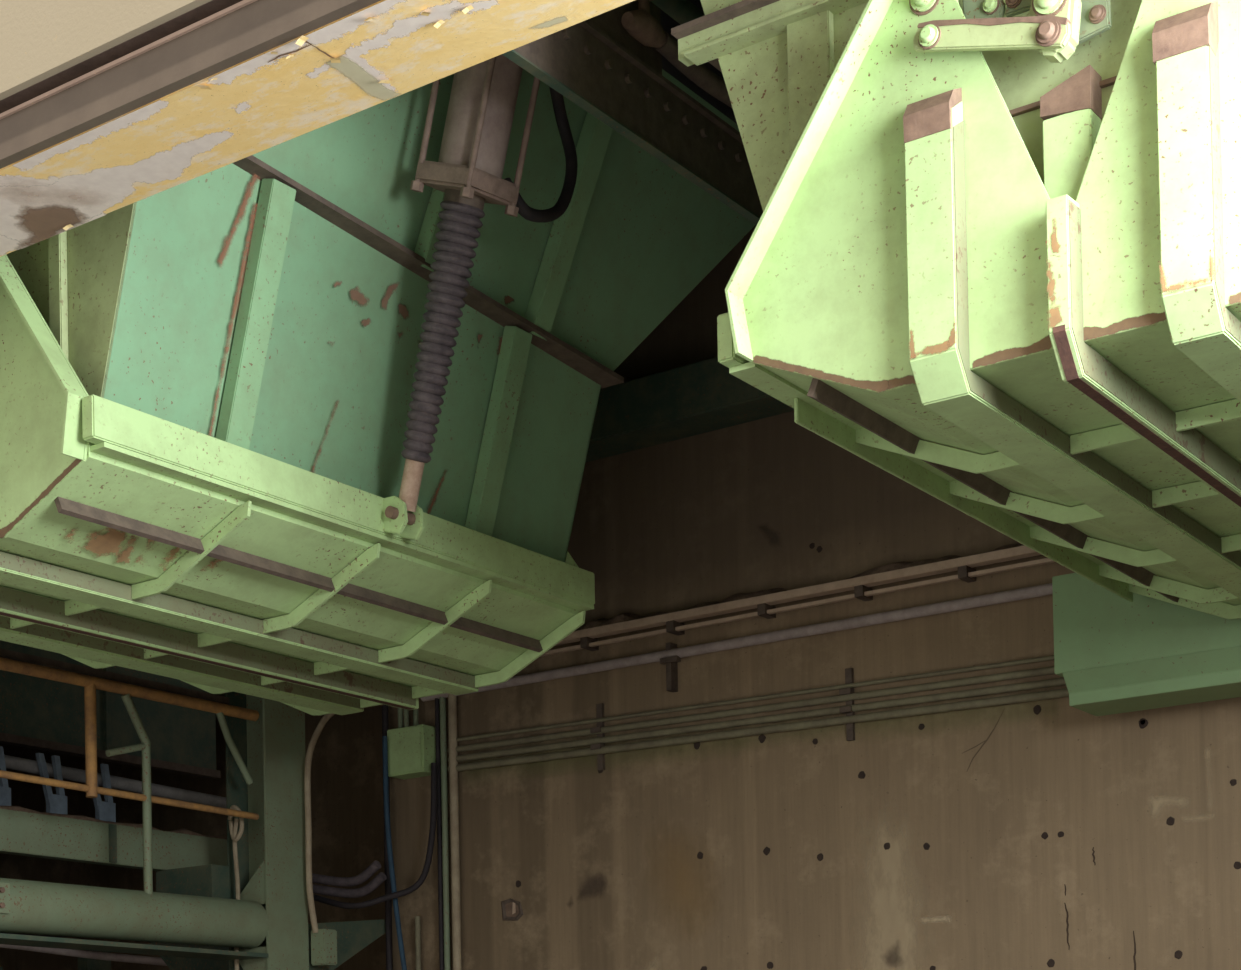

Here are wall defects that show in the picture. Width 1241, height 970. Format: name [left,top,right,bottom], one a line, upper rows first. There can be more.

rust [918,16,1071,28]
peeling [0,100,234,256]
leakage [17,206,85,246]
peeling [334,281,409,338]
rust [909,323,956,358]
rust [753,355,916,392]
rust [972,219,1241,507]
rust [65,527,156,565]